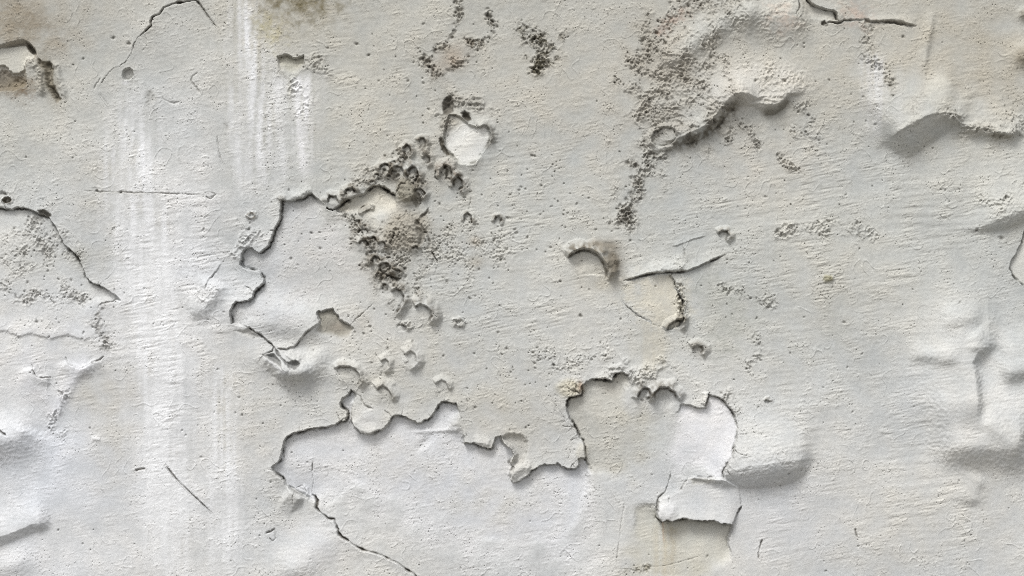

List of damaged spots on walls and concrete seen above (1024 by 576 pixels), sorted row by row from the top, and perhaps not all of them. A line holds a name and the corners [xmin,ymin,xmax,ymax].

spalling [0,39,68,104]
crack [92,0,218,107]
crack [794,0,918,28]
spalling [430,93,504,174]
peeling [226,154,432,346]
peeling [268,347,744,576]
crack [310,459,417,576]